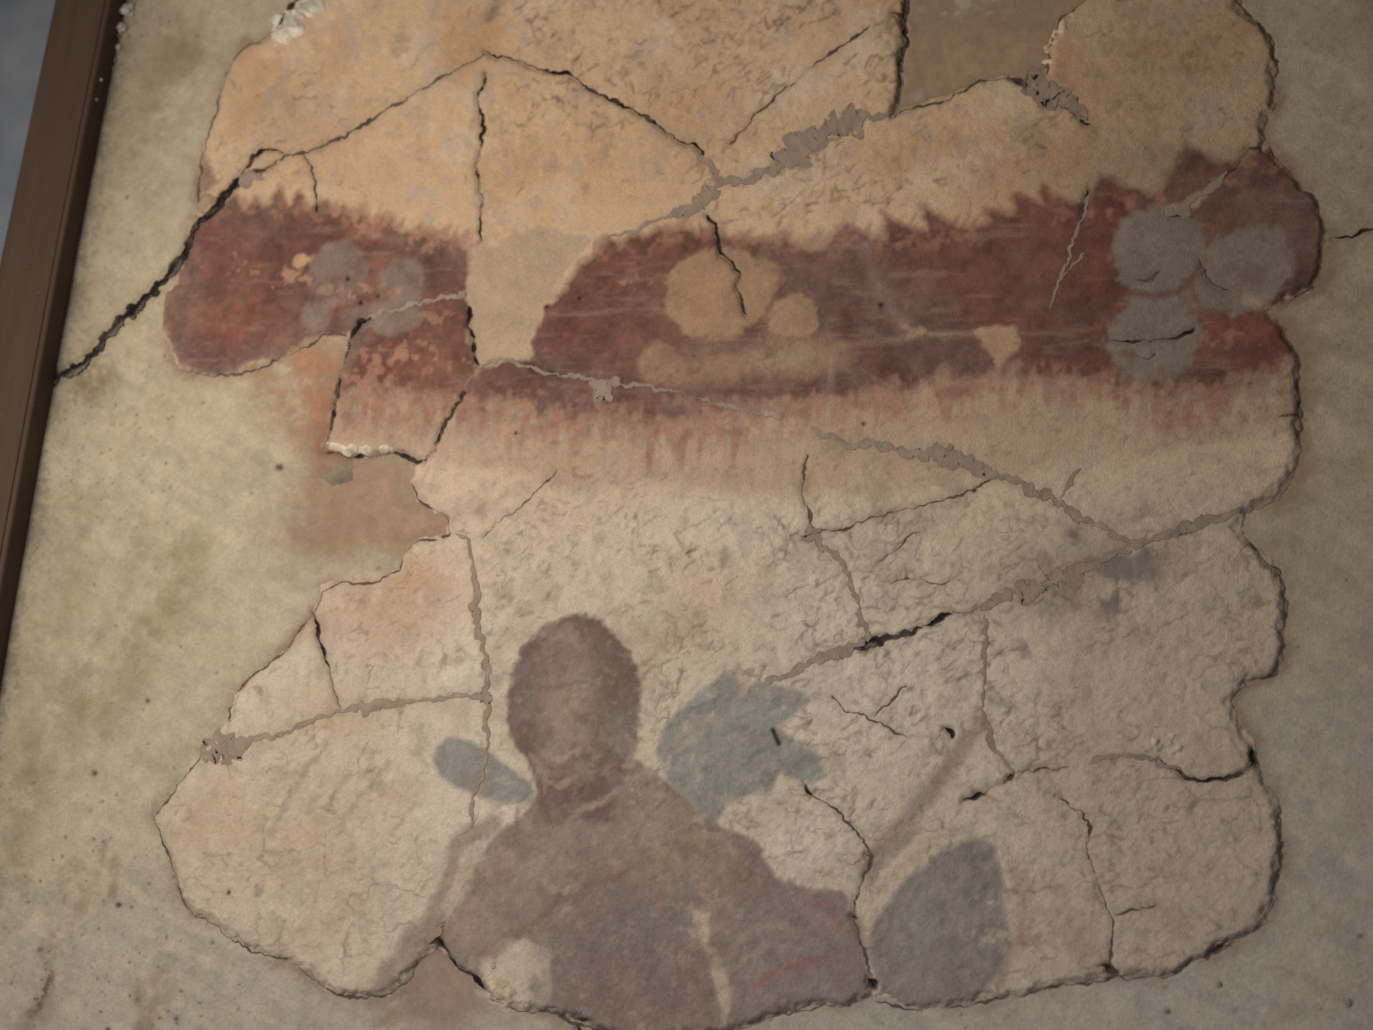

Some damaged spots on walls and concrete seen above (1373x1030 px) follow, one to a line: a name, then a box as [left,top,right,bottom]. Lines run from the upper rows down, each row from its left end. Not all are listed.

spalling [271,0,327,46]
crack [54,0,1090,384]
crack [1164,0,1279,218]
crack [1333,228,1373,239]
crack [154,287,1311,1030]